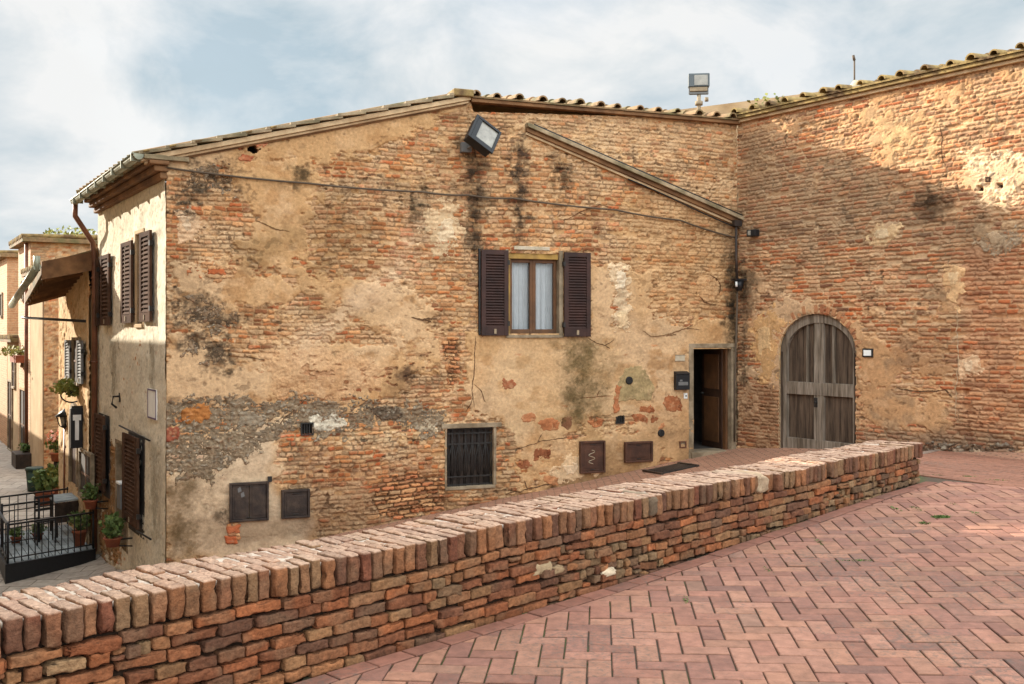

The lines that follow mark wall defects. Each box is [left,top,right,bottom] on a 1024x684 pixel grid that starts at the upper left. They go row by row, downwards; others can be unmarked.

flaking render [173,143,268,244]
flaking render [416,197,470,262]
leakage [465,186,487,250]
leakage [505,133,533,232]
crack [643,325,699,337]
crack [466,337,485,411]
spalling [166,388,447,489]
spalling [632,395,683,430]